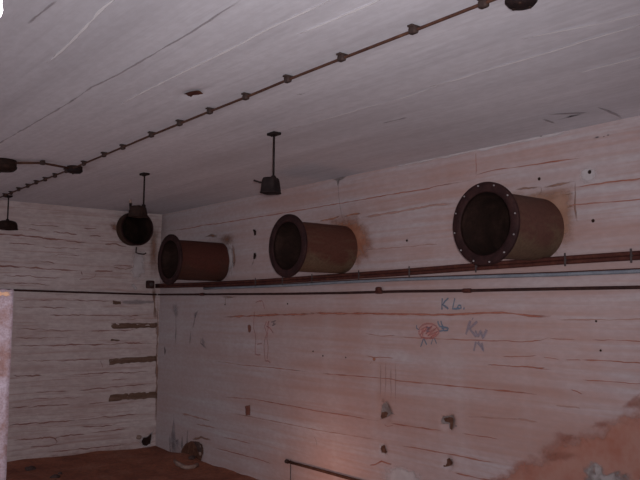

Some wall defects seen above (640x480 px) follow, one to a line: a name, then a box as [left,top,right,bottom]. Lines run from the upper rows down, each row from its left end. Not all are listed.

rust [519,182,576,234]
rust [321,213,369,258]
spalling [381,402,393,419]
spalling [441,415,457,430]
spalling [136,433,152,447]